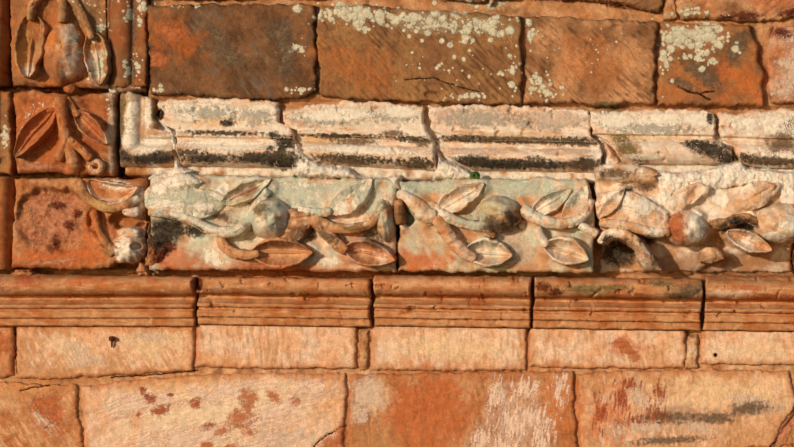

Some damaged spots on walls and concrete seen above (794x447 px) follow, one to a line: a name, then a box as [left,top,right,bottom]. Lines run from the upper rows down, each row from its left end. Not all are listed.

crack [313,425,347,447]
crack [769,406,794,447]